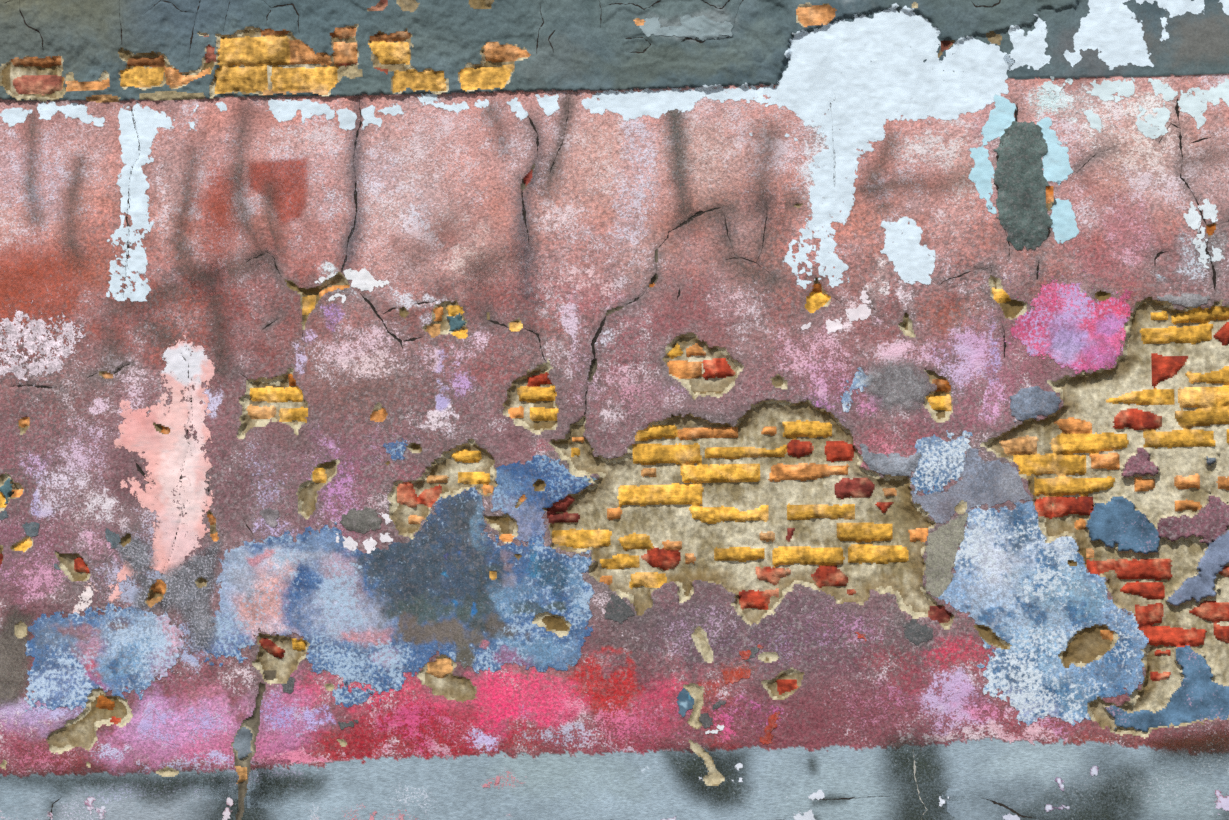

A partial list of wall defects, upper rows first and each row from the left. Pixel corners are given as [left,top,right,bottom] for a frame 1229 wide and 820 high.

flaking render [0,24,560,302]
crack [341,103,437,348]
crack [489,320,546,362]
crack [520,99,569,244]
crack [584,207,775,419]
peeling [579,0,1229,334]
crack [1159,98,1228,289]
flaking render [0,472,24,520]
flaking render [14,268,1229,768]
crack [231,682,266,820]
flaking render [676,683,743,786]
peeling [791,790,825,820]